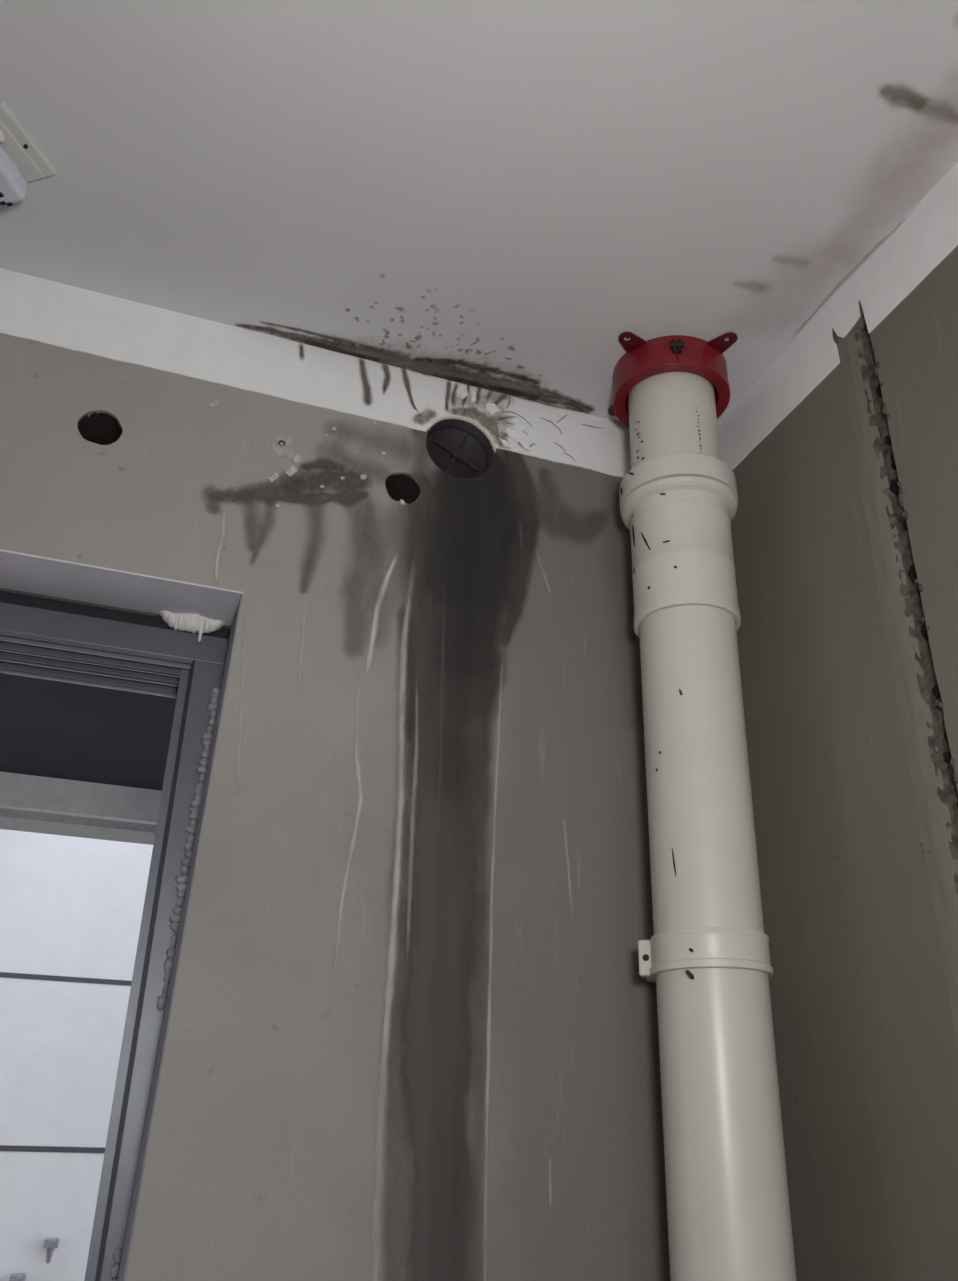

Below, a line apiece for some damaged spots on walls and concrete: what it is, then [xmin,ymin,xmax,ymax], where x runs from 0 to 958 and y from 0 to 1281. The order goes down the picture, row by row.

water stain [236,310,594,414]
water stain [209,458,368,580]
water stain [333,429,604,1281]